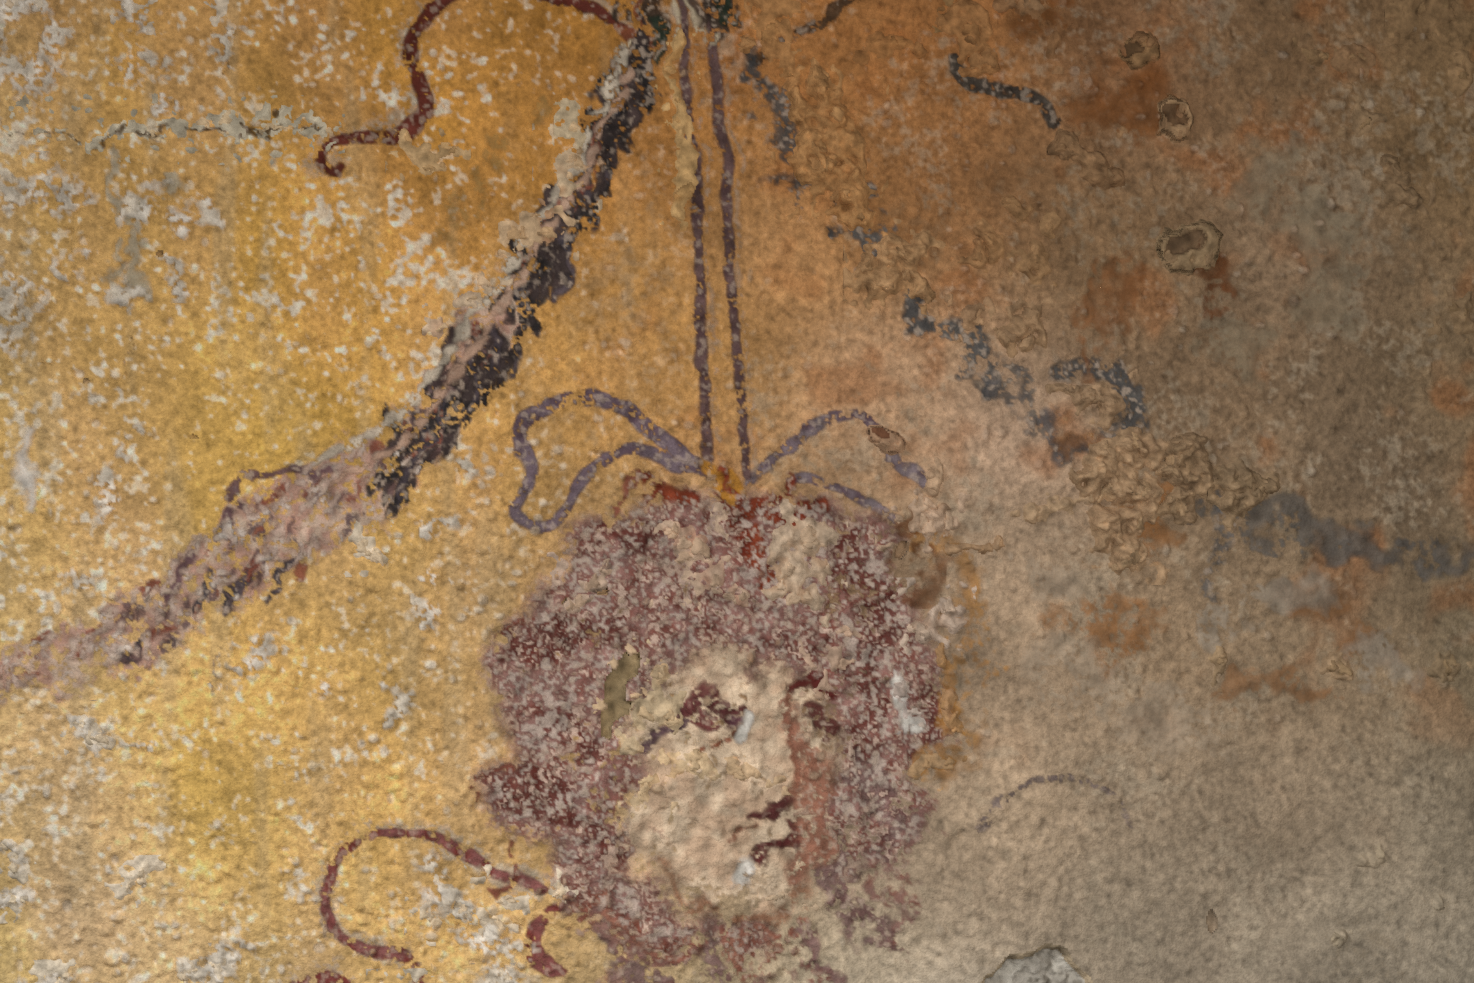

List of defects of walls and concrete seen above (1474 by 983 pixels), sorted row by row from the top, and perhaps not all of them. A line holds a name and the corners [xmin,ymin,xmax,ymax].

peeling [592,635,648,740]
flaking render [980,943,1093,983]